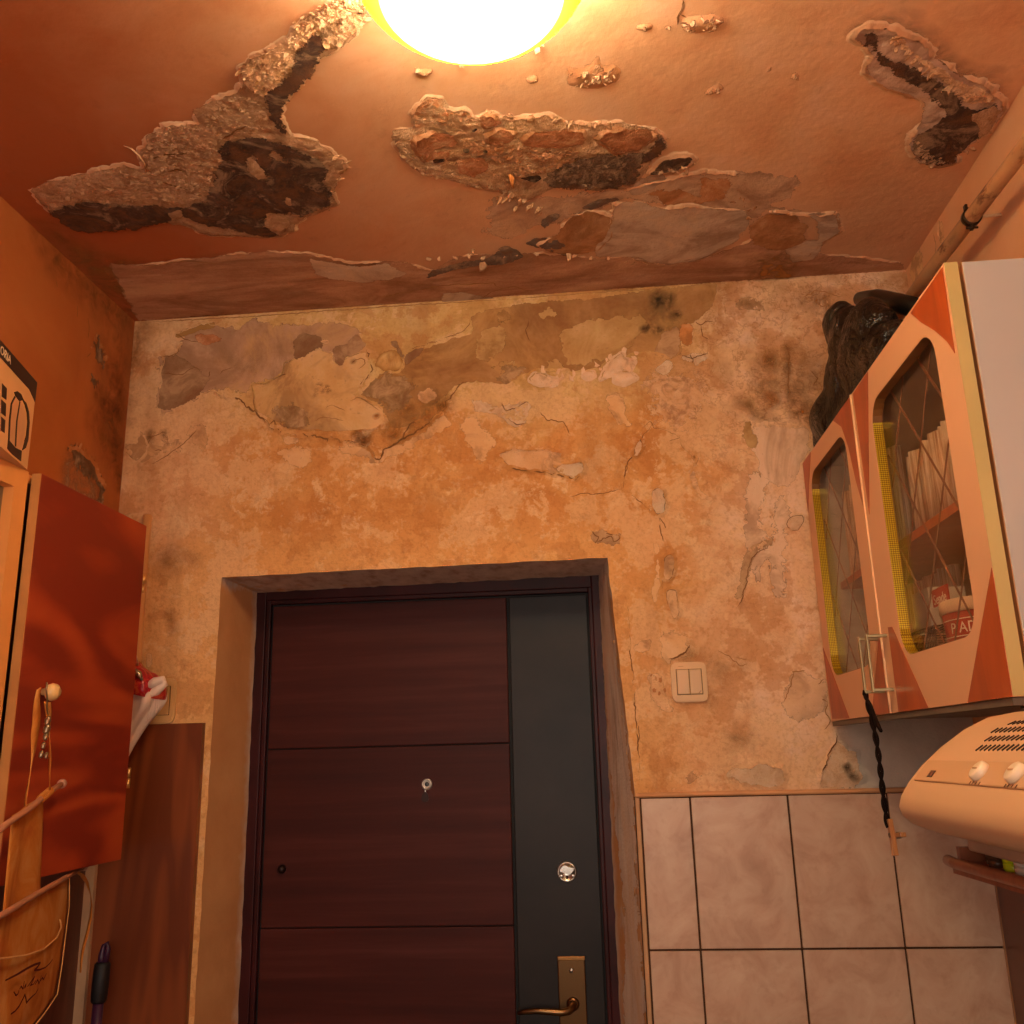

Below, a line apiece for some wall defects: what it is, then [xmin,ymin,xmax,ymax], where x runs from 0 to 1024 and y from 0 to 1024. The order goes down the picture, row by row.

spalling [846,18,1009,169]
peeling [28,0,904,484]
spalling [65,443,107,505]
crack [210,382,465,460]
peeling [591,529,622,546]
crack [572,421,701,588]
peeling [732,408,811,606]
crack [625,603,640,787]
spalling [813,734,869,789]